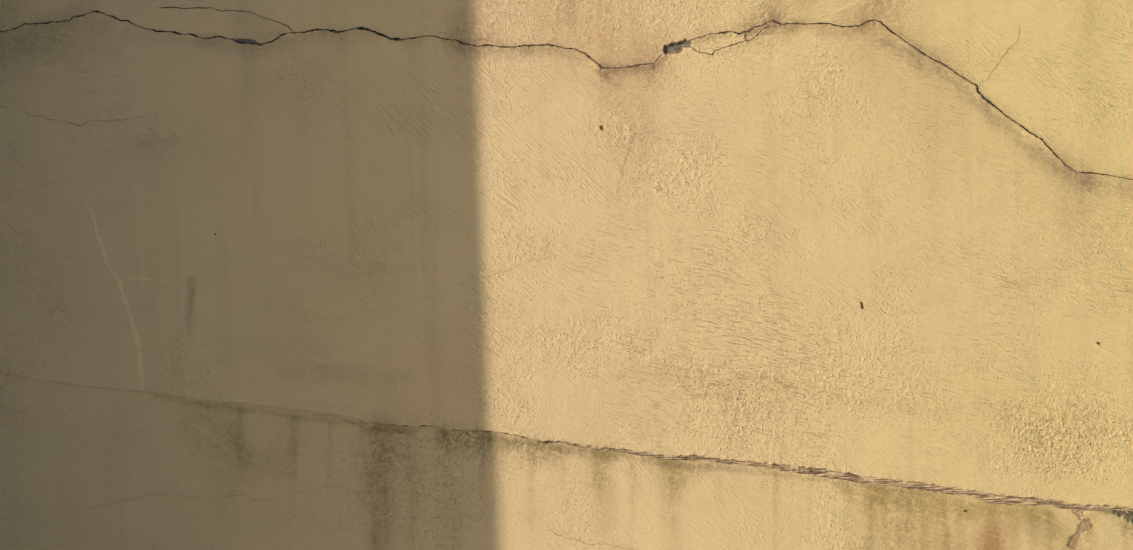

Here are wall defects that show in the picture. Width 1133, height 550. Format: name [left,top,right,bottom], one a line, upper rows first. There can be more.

crack [0,7,661,81]
crack [686,19,1133,180]